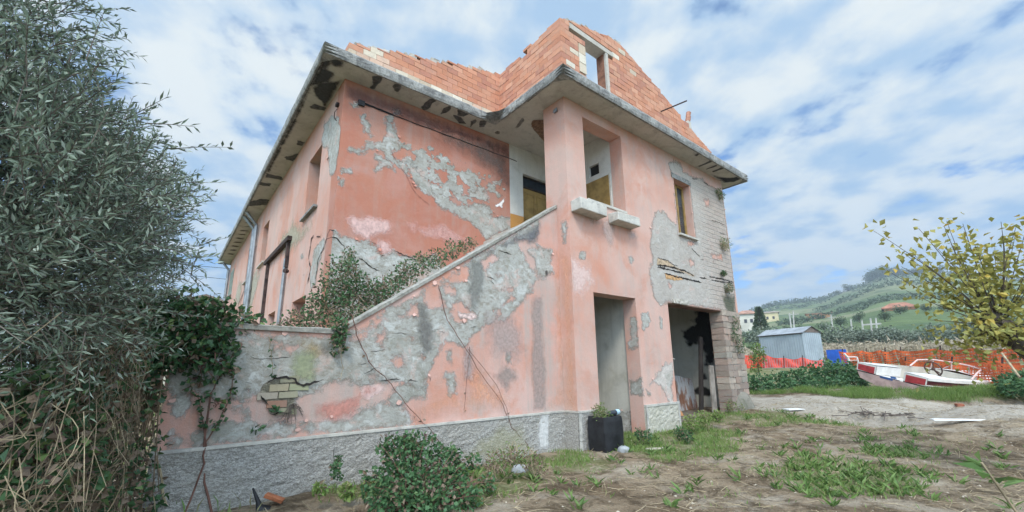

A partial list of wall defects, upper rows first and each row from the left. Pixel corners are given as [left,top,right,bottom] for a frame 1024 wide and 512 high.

peeling [159,99,568,449]
flaking render [628,153,737,350]
crack [246,357,324,415]
peeling [630,361,674,402]